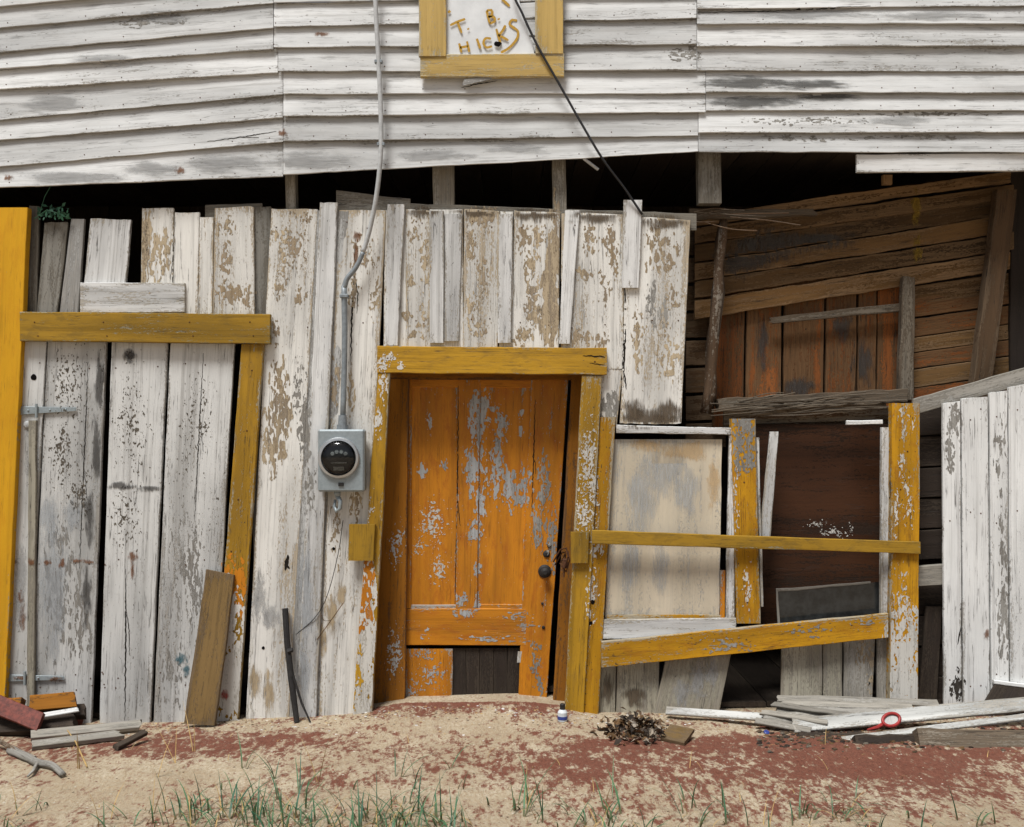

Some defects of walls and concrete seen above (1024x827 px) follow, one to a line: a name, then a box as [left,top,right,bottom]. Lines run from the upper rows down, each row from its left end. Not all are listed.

damp [705,77,854,108]
peeling [270,211,312,309]
peeling [510,187,610,348]
peeling [575,224,620,308]
peeling [631,217,685,384]
peeling [37,343,92,679]
peeling [260,317,317,520]
peeling [389,495,453,587]
peeling [462,387,559,576]
peeling [575,390,619,626]
damp [623,399,681,429]
peeling [949,666,966,703]